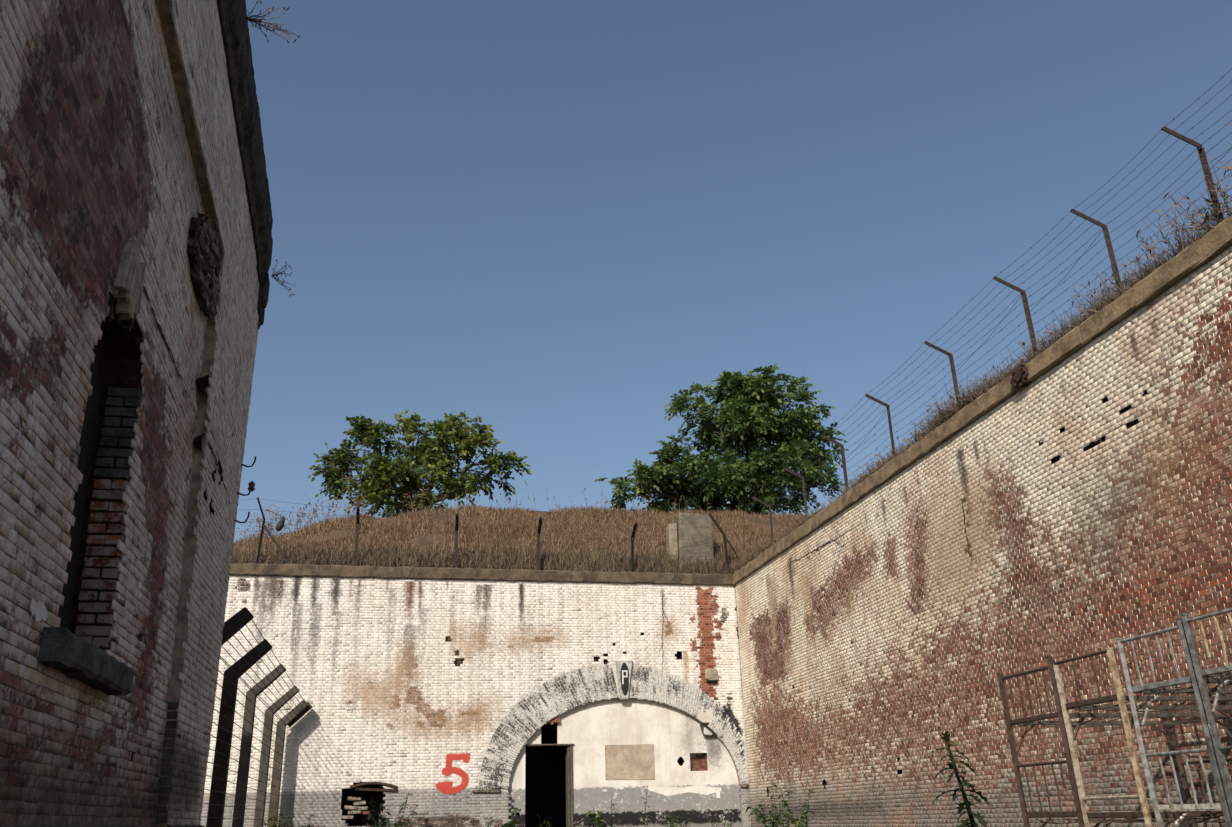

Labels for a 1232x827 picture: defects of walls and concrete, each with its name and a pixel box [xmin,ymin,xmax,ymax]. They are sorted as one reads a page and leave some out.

peeling [0,0,176,793]
leakage [254,576,320,655]
leakage [331,579,360,614]
peeling [688,261,1232,824]